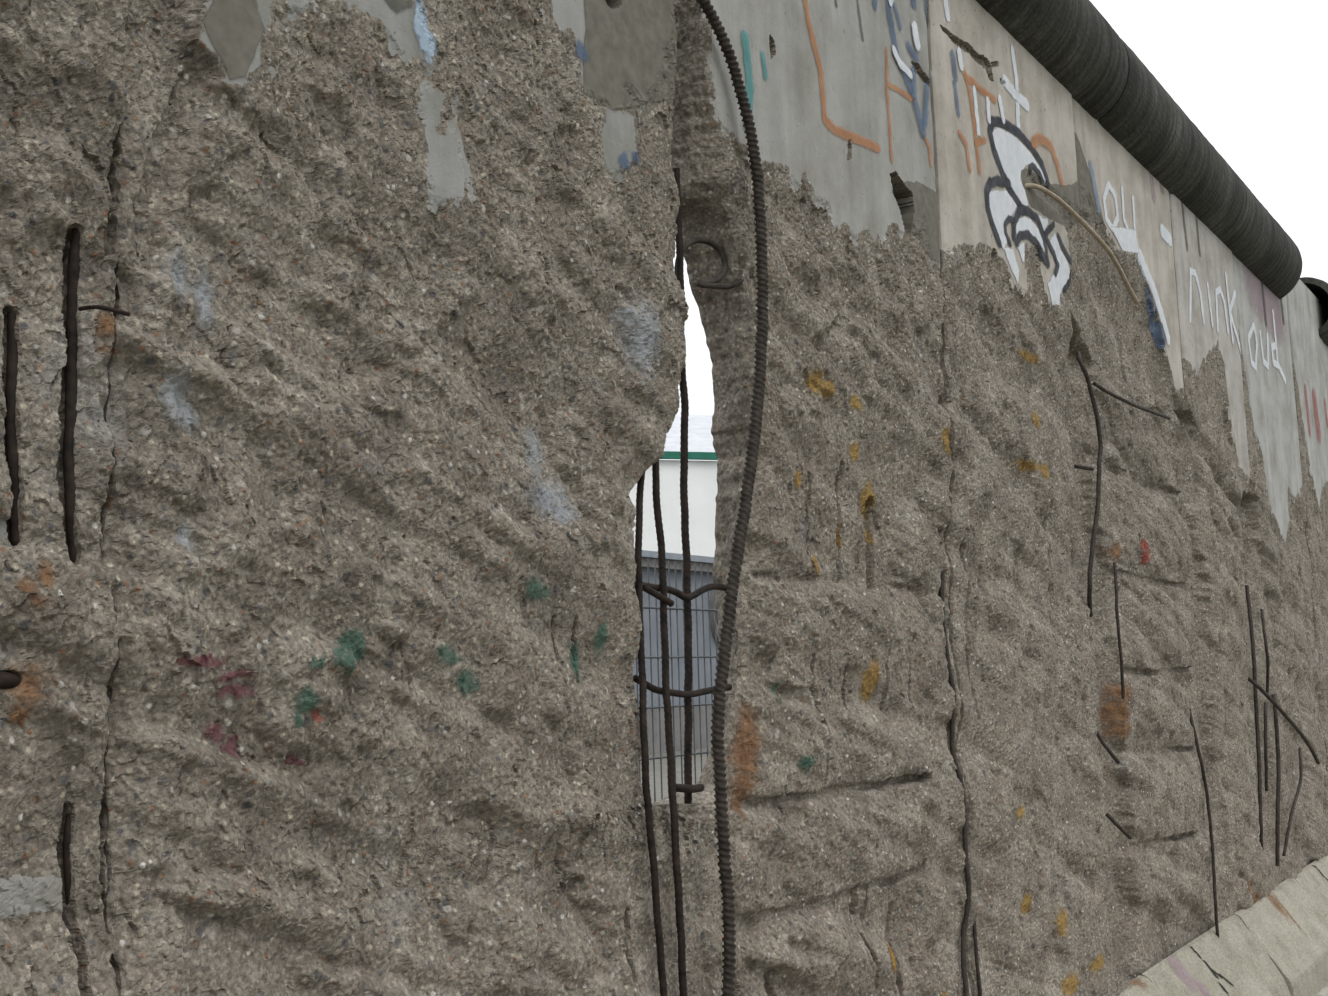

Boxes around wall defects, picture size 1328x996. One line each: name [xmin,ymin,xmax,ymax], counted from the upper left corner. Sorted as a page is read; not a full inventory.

crack [98,834,106,895]
crack [101,747,109,799]
spalling [0,0,758,996]
spalling [634,0,1328,996]